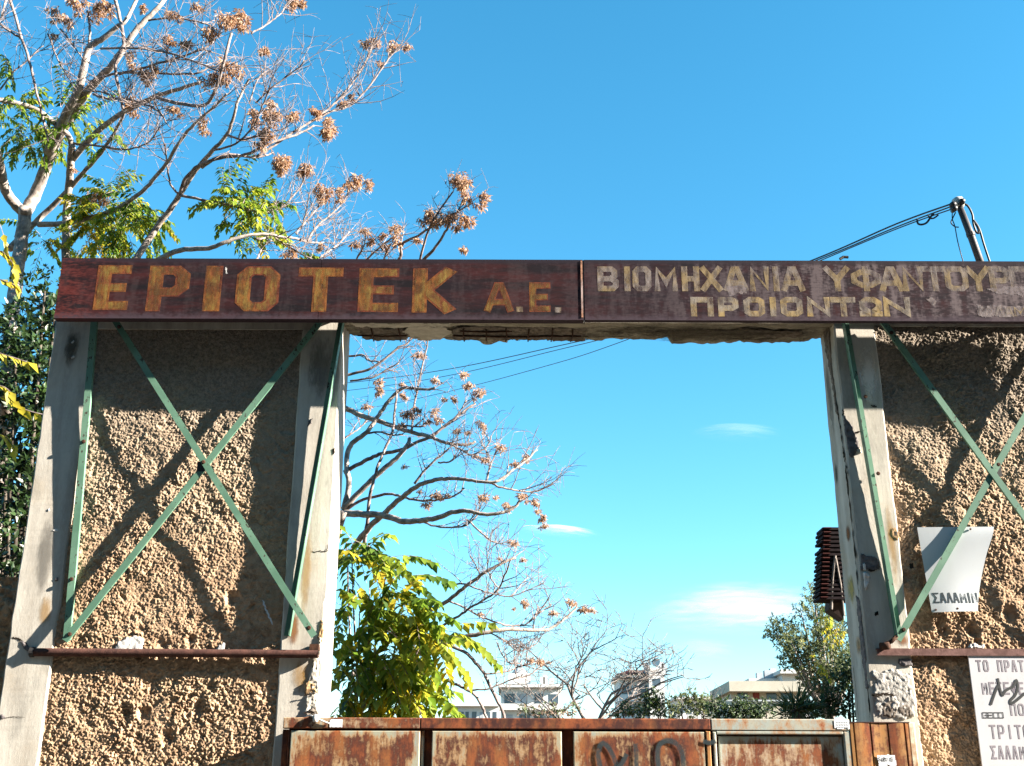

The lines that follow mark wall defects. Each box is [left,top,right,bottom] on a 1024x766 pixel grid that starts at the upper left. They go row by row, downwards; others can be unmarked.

spalling [351,323,586,342]
flaking render [856,553,917,721]